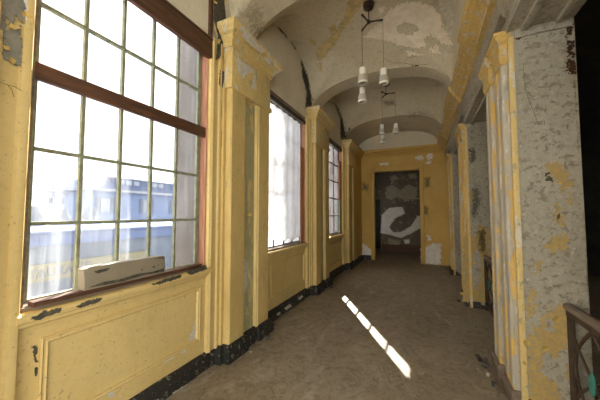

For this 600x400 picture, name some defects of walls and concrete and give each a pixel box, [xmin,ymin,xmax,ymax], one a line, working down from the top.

peeling [0,0,33,66]
peeling [214,0,227,60]
peeling [309,0,365,72]
flaking render [363,1,453,56]
rust [565,23,577,75]
peeling [543,161,575,254]
peeling [31,307,62,321]
peeling [75,298,102,308]
peeling [91,266,207,287]
flaking render [420,235,443,265]
peeling [460,223,491,303]
peeling [523,288,568,400]